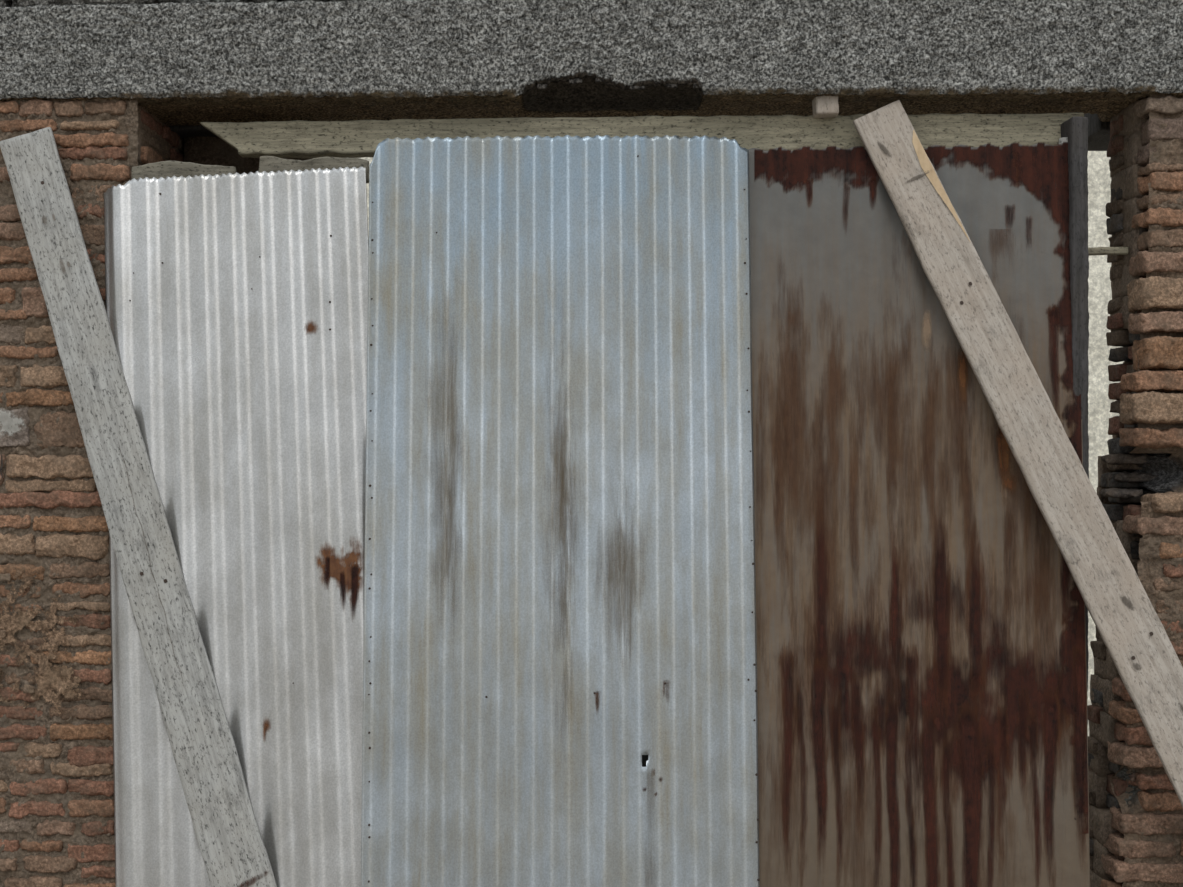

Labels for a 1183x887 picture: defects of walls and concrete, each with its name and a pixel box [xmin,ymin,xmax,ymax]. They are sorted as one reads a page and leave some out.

rust [754,146,880,219]
rust [924,142,1082,464]
rust [317,545,362,615]
rust [757,310,1089,887]